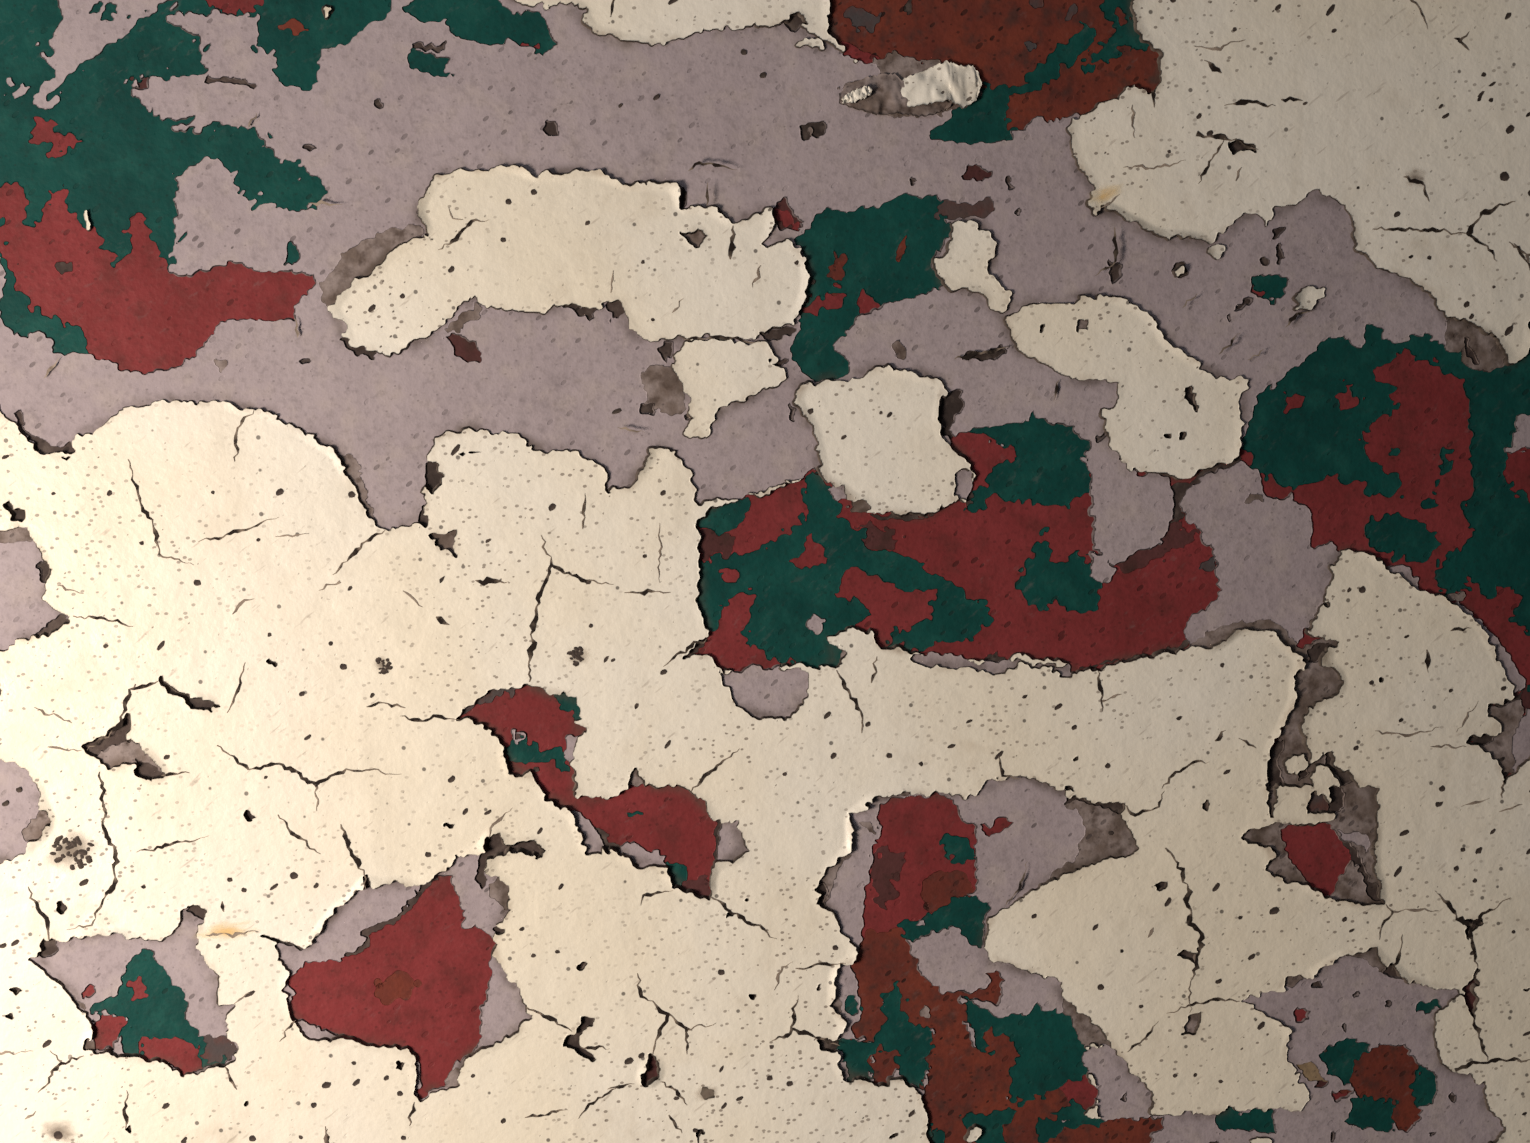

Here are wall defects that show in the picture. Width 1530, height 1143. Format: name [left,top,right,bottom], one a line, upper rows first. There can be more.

crack [1373,176,1530,270]
crack [128,460,307,565]
crack [475,523,670,682]
peeling [0,0,1530,904]
crack [28,681,207,940]
crack [217,663,399,889]
peeling [30,906,238,1075]
peeling [271,833,540,1100]
crack [525,973,714,1133]
crack [711,897,845,1046]
peeling [816,776,1504,1143]
crack [1128,848,1239,1052]